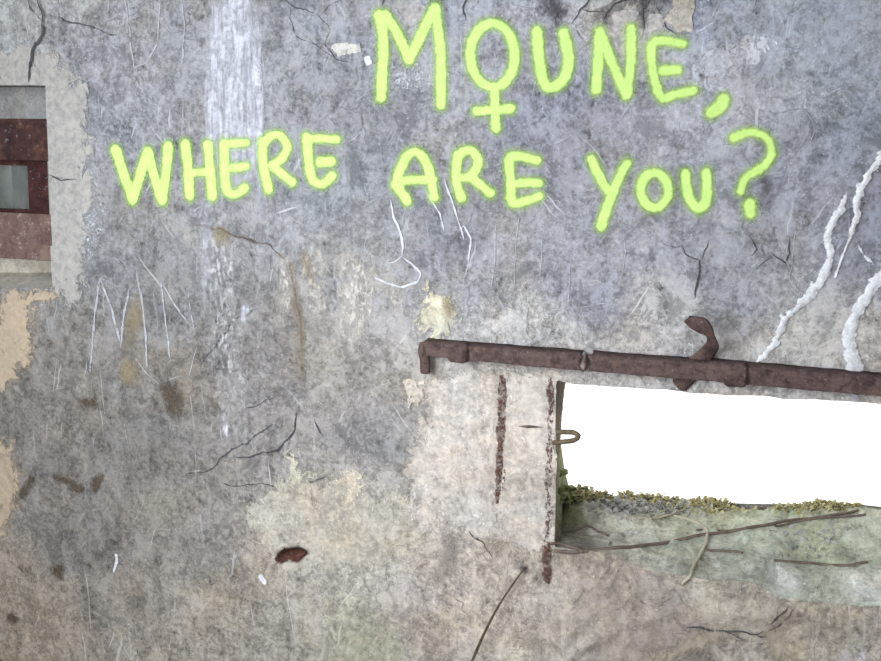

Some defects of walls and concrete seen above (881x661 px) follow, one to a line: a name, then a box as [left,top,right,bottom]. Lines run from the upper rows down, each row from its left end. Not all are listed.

crack [28,0,116,82]
crack [550,0,676,39]
crack [664,241,709,296]
peeling [0,437,35,543]
crack [187,413,322,487]
rust [494,376,507,504]
rust [542,378,554,584]
crack [685,626,763,641]